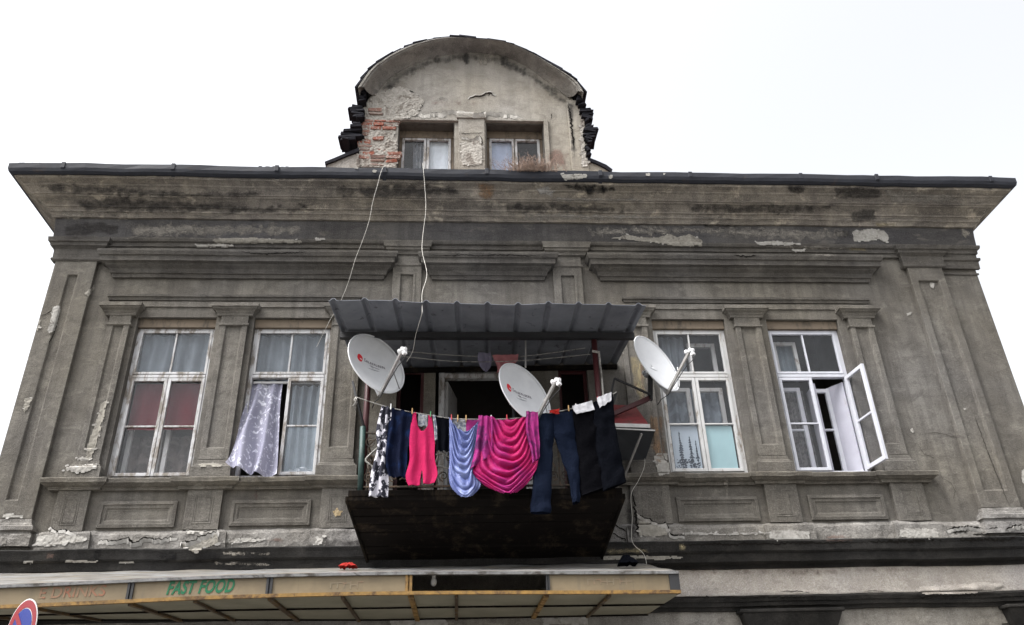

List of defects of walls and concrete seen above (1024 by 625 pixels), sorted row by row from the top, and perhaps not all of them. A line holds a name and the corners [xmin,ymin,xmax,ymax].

flaking render [354,86,424,173]
crack [385,88,523,149]
flaking render [460,139,483,166]
water stain [52,185,307,237]
water stain [340,185,456,197]
flaking render [613,233,703,247]
water stain [507,183,956,256]
flaking render [852,228,889,243]
flaking render [62,400,109,474]
crack [613,418,1024,546]
peeling [32,533,87,547]
crack [98,529,264,548]